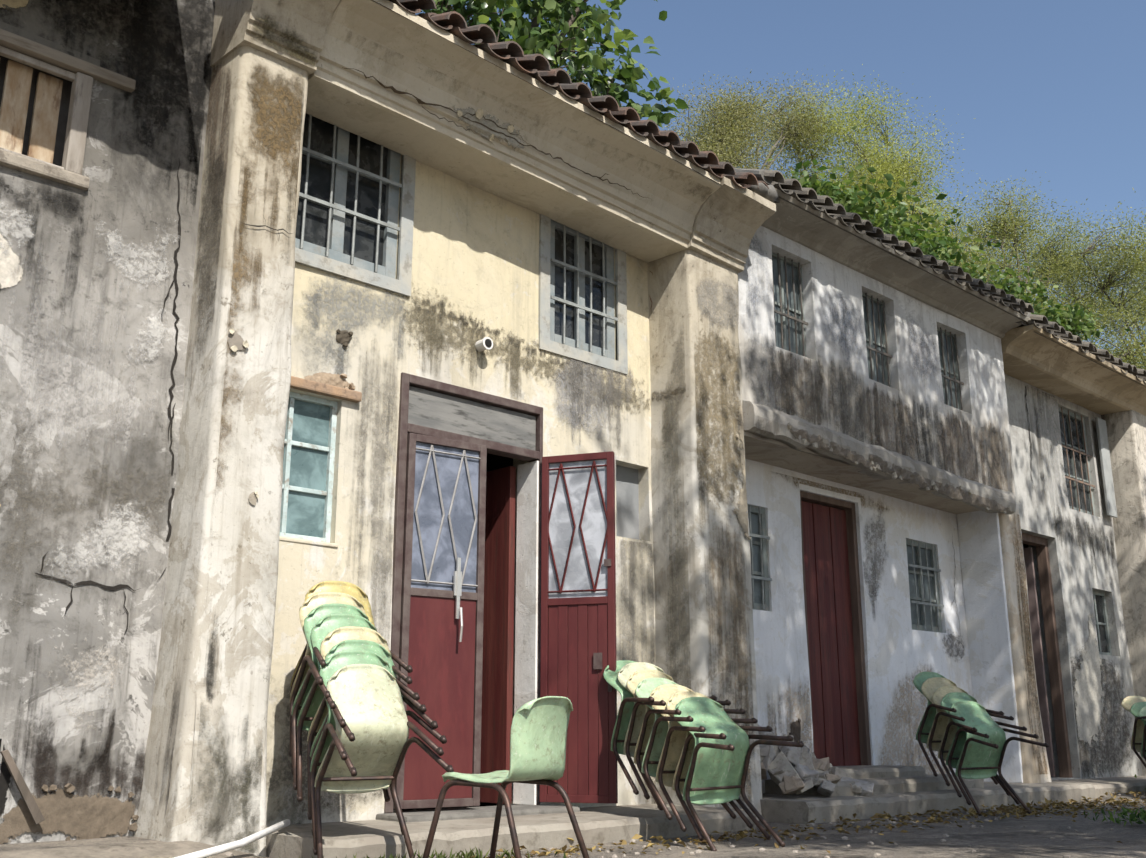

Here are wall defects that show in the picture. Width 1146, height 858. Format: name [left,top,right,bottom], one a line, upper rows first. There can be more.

peeling [0,0,29,9]
peeling [0,233,23,289]
water stain [0,177,82,270]
water stain [42,0,231,349]
crack [344,68,653,201]
water stain [125,316,169,369]
crack [161,161,181,540]
water stain [307,279,986,689]
spalling [787,423,1012,514]
crack [35,552,166,635]
water stain [709,534,754,746]
water stain [1070,655,1134,779]